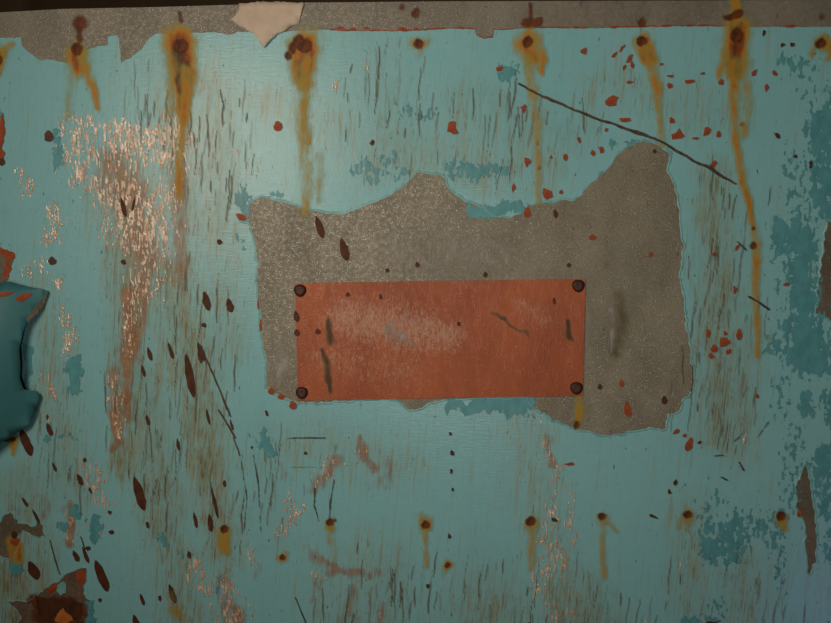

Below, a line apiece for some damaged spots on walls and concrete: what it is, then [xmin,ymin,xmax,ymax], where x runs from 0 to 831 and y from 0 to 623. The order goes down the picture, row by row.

corrosion [66,16,99,110]
corrosion [162,12,197,201]
corrosion [285,30,320,184]
corrosion [513,3,547,204]
corrosion [634,19,664,147]
corrosion [716,0,761,358]
peeling [0,200,78,456]
peeling [234,128,702,451]
peeling [693,42,831,594]
peeling [0,497,46,580]
peeling [8,455,116,623]
spalling [133,477,146,510]